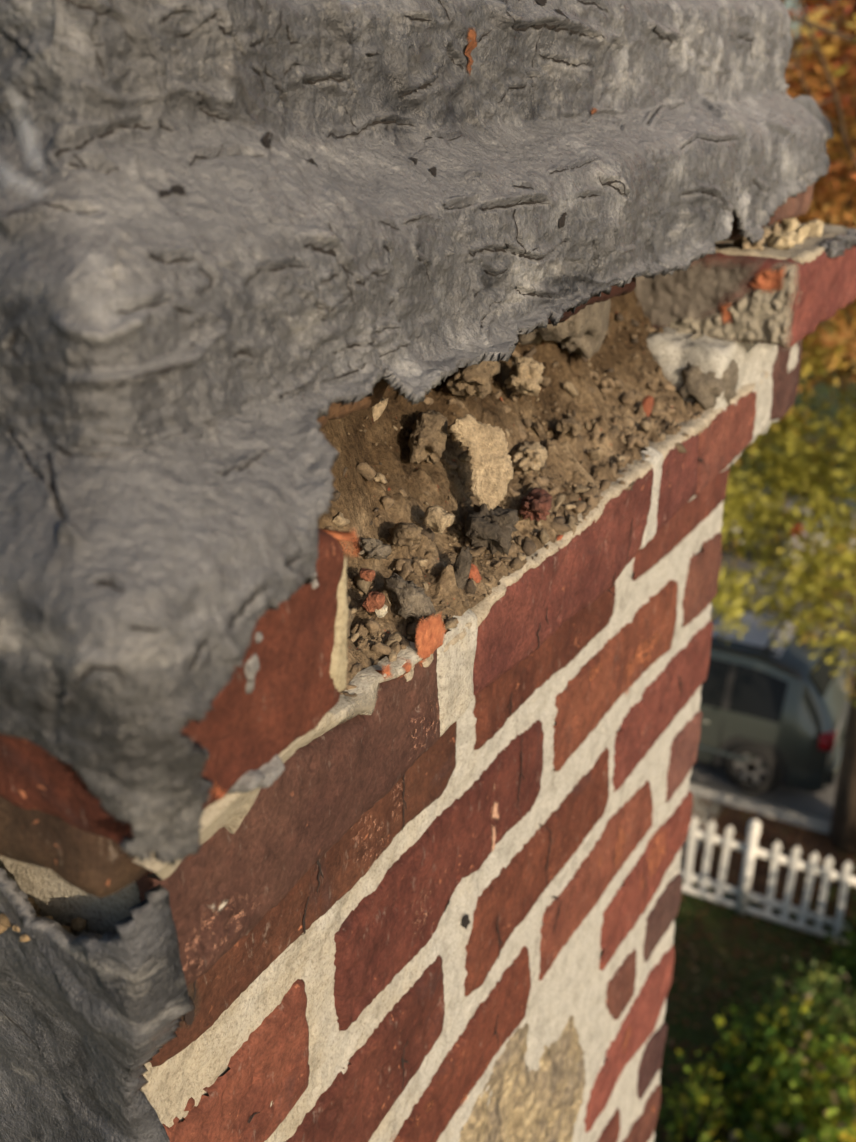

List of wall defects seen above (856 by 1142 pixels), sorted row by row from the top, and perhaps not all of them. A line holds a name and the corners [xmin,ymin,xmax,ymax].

crack [159,0,465,141]
rust [465,29,477,74]
crack [478,0,608,103]
crack [54,108,174,175]
crack [189,91,272,166]
crack [117,254,213,314]
crack [246,157,629,398]
crack [8,428,112,521]
peeling [447,414,514,512]
spalling [319,528,357,555]
spalling [375,614,446,678]
peeling [215,754,284,799]